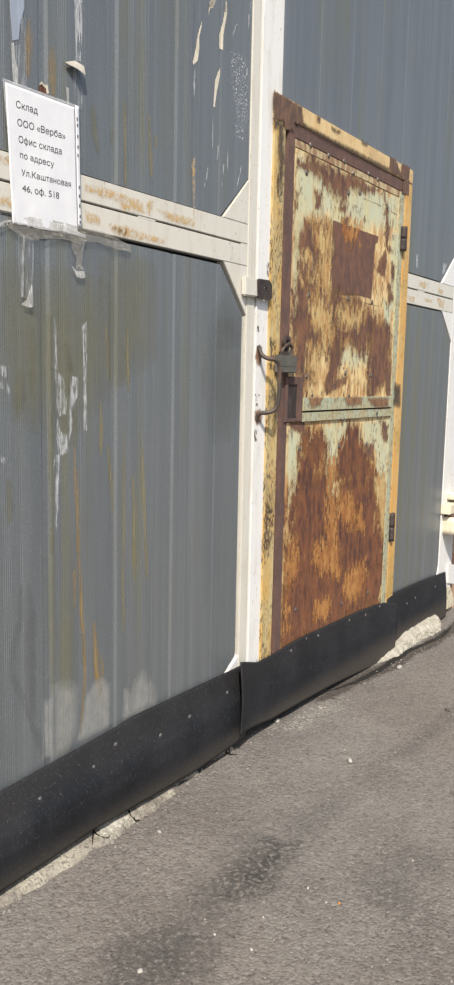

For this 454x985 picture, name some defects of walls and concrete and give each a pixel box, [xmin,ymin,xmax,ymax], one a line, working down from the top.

peeling [193,22,202,65]
peeling [209,0,227,50]
rust [273,90,410,198]
rust [86,186,151,212]
rust [112,226,163,242]
rust [255,337,276,370]
peeling [301,216,367,383]
rust [290,154,400,407]
damp [54,325,87,525]
peeling [282,455,369,637]
rust [263,419,389,647]
peeling [374,472,386,539]